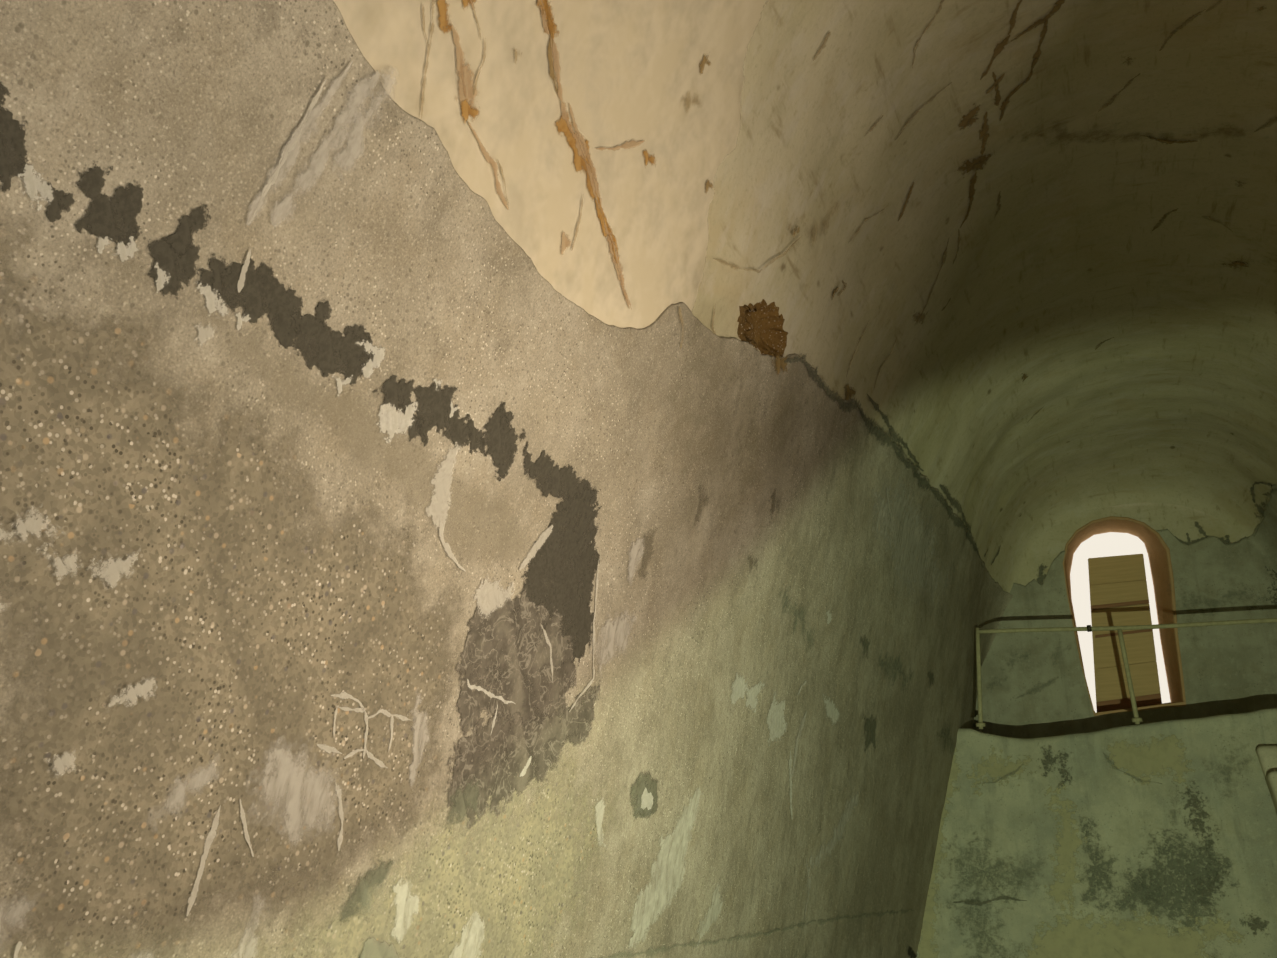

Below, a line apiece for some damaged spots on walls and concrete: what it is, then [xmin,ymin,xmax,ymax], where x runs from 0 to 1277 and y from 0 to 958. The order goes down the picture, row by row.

corrosion [437,0,509,210]
peeling [333,0,769,329]
corrosion [537,0,655,310]
crack [813,32,831,61]
crack [846,0,1065,388]
spalling [737,299,788,357]
flaking render [0,244,455,958]
peeling [631,772,658,819]
mould [1042,746,1072,786]
mould [1082,787,1236,933]
water stain [1241,915,1269,935]